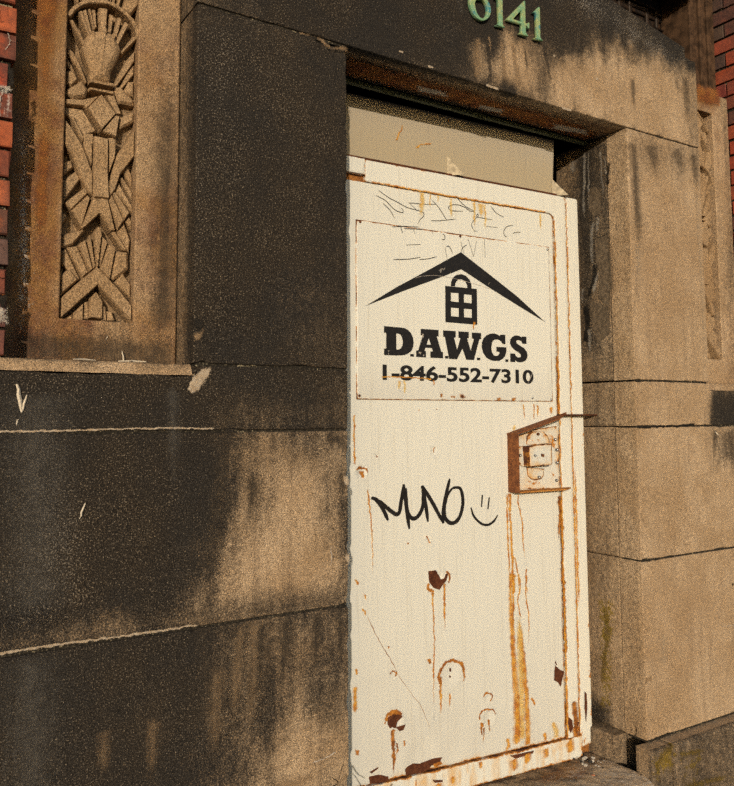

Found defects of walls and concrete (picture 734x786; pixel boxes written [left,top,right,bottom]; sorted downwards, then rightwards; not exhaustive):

corrosion [372,181,545,226]
spalling [188,368,211,393]
corrosion [353,415,368,478]
corrosion [543,203,583,758]
corrosion [427,584,465,709]
corrosion [506,494,535,771]
corrosion [479,692,496,740]
corrosion [391,729,405,770]